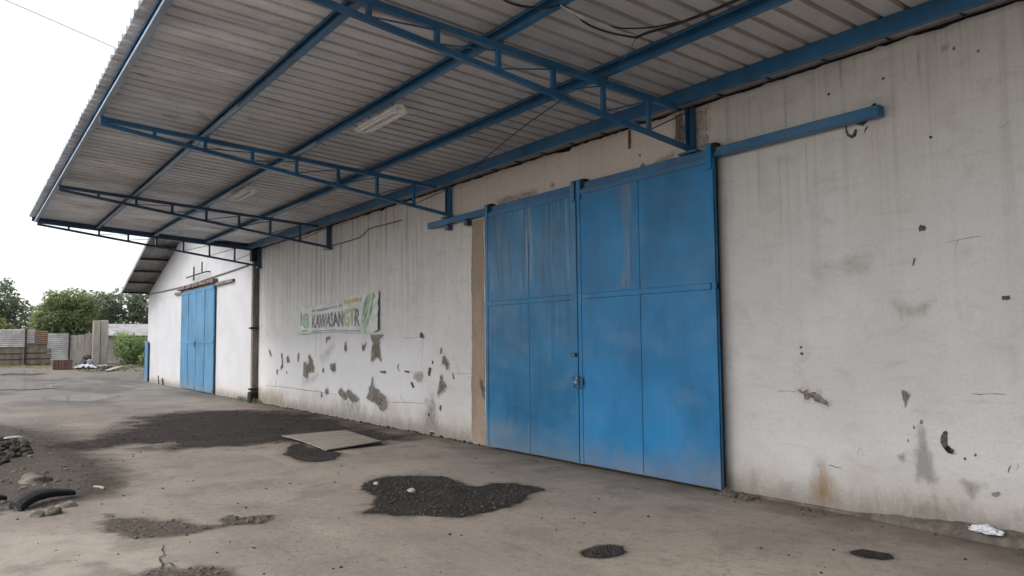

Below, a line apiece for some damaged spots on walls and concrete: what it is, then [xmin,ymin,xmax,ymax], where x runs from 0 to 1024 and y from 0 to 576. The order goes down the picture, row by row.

flaking render [269,350,336,381]
flaking render [321,333,415,413]
flaking render [428,347,455,417]
flaking render [798,387,829,407]
flaking render [901,389,911,407]
flaking render [940,431,977,460]